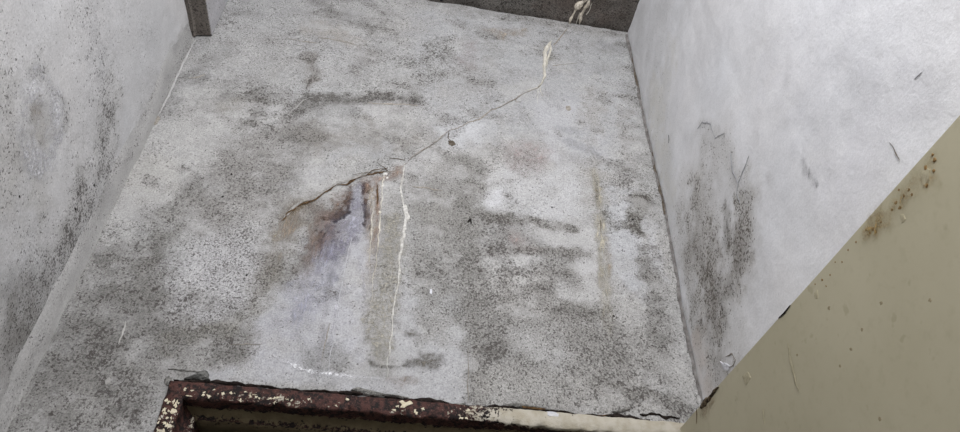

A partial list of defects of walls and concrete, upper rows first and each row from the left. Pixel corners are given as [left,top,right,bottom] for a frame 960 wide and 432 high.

crack [408,86,540,161]
corrosion [366,171,398,236]
damp [287,166,410,380]
damp [404,354,438,381]